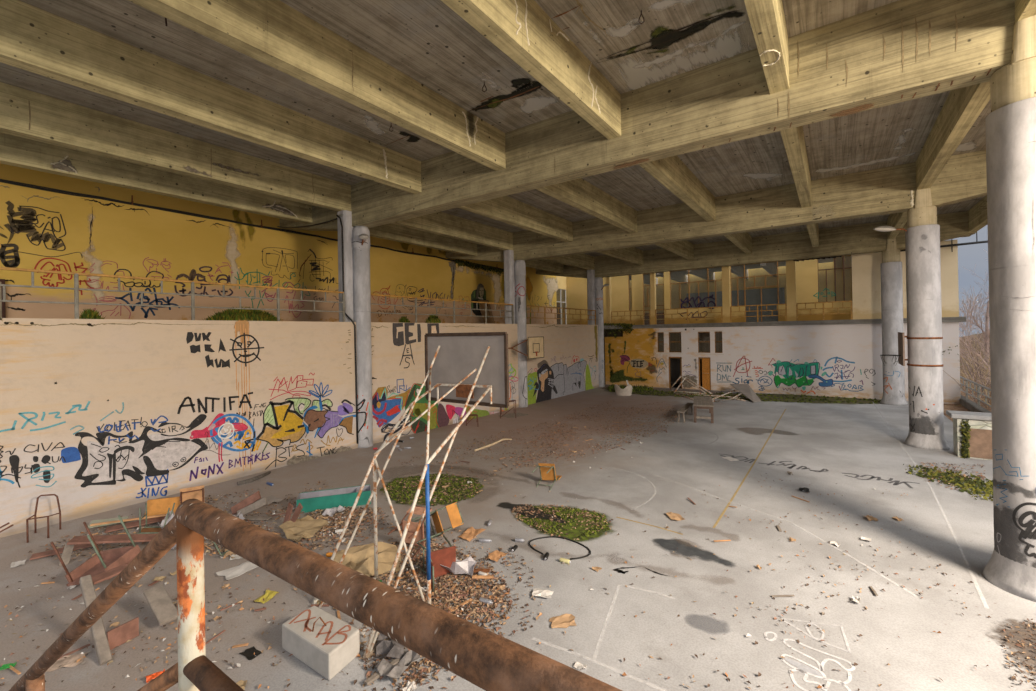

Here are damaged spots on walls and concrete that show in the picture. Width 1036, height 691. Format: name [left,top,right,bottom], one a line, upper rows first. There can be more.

corrosion [234,320,251,471]